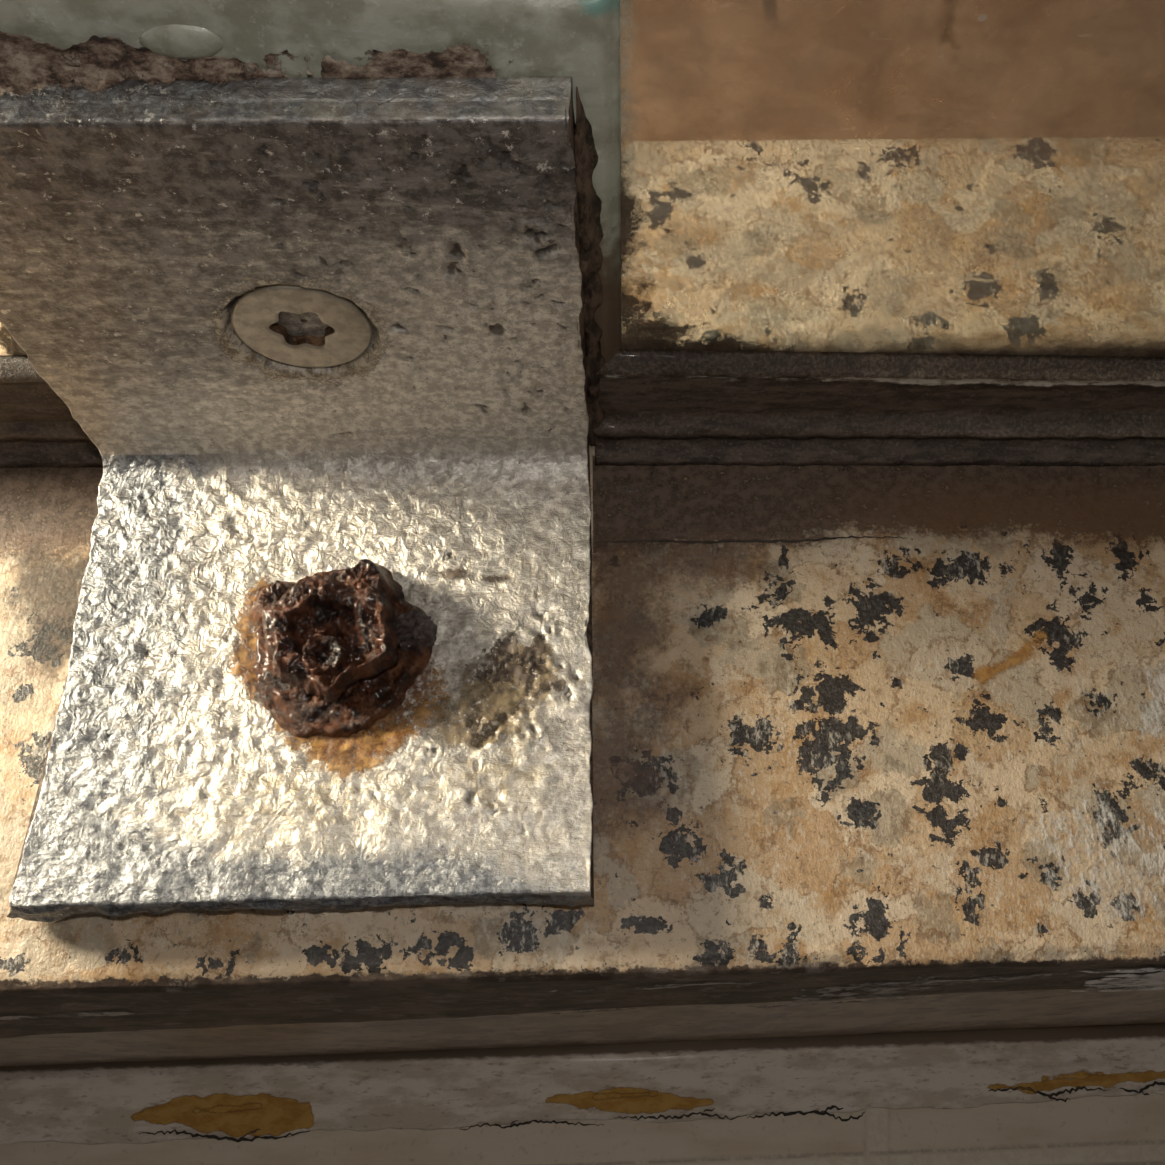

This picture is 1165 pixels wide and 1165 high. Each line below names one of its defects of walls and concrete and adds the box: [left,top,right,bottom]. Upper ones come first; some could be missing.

peeling [321,44,496,80]
corrosion [228,576,296,708]
damp [592,456,1165,836]
corrosion [272,558,566,779]
corrosion [131,1093,314,1137]
corrosion [546,1087,714,1114]
crack [460,1105,865,1130]
corrosion [988,1070,1165,1094]
crack [988,1081,1165,1102]